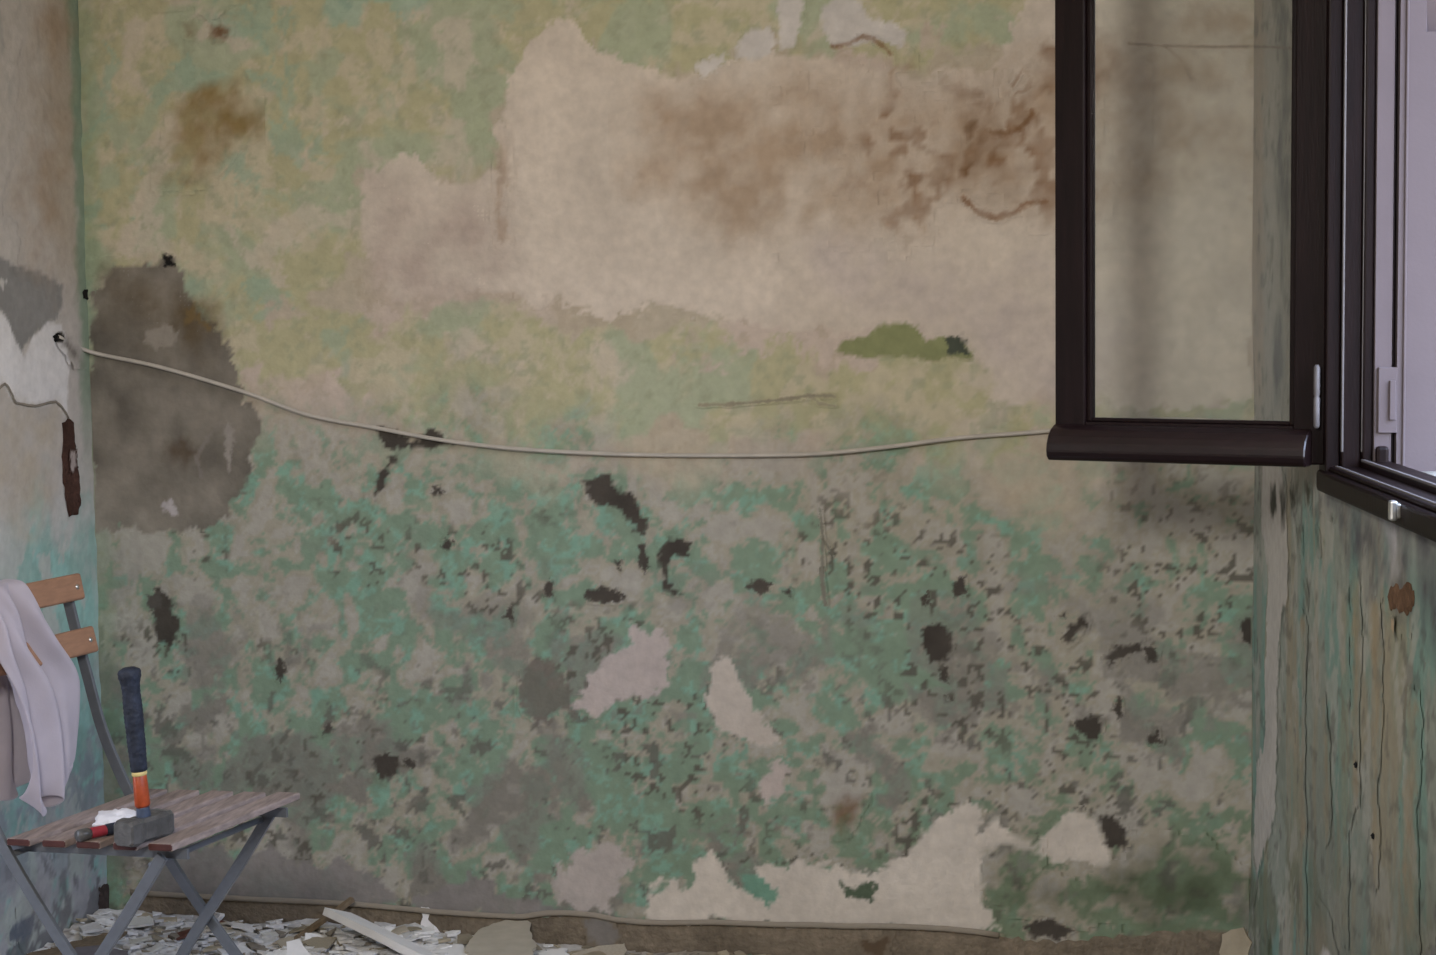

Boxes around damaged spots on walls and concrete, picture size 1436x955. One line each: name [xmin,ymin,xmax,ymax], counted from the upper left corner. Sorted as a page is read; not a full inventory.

leakage [489,125,516,249]
peeling [350,0,1056,422]
corrosion [768,31,1055,261]
corrosion [1095,4,1152,224]
peeling [1095,0,1254,418]
leakage [0,376,65,554]
corrosion [62,418,81,517]
flaking render [86,246,265,536]
flaking render [578,473,694,606]
leakage [1257,466,1436,955]
leakage [0,853,99,955]
flaking render [98,798,1253,955]